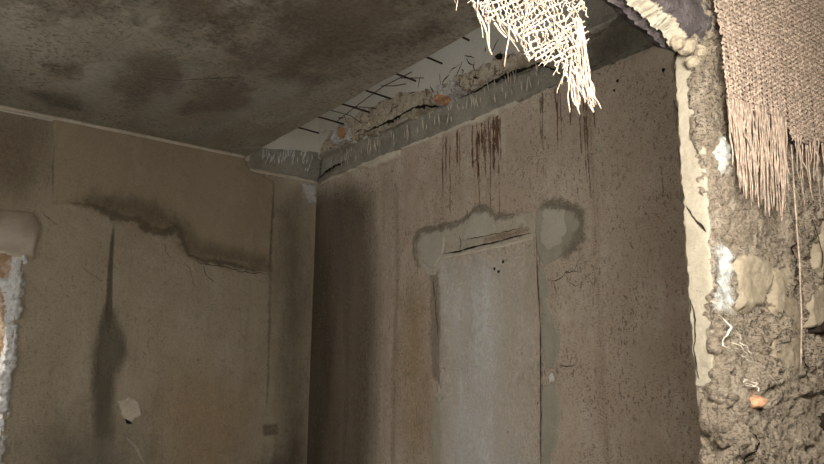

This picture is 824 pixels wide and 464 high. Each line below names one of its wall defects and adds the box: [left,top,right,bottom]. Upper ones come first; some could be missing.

crack [670,52,678,127]
water stain [84,198,262,268]
rust [442,130,460,184]
rust [471,116,501,213]
spalling [248,0,744,390]
crack [677,147,706,231]
water stain [93,230,125,446]
peeling [732,221,824,380]
flaking render [749,394,768,409]